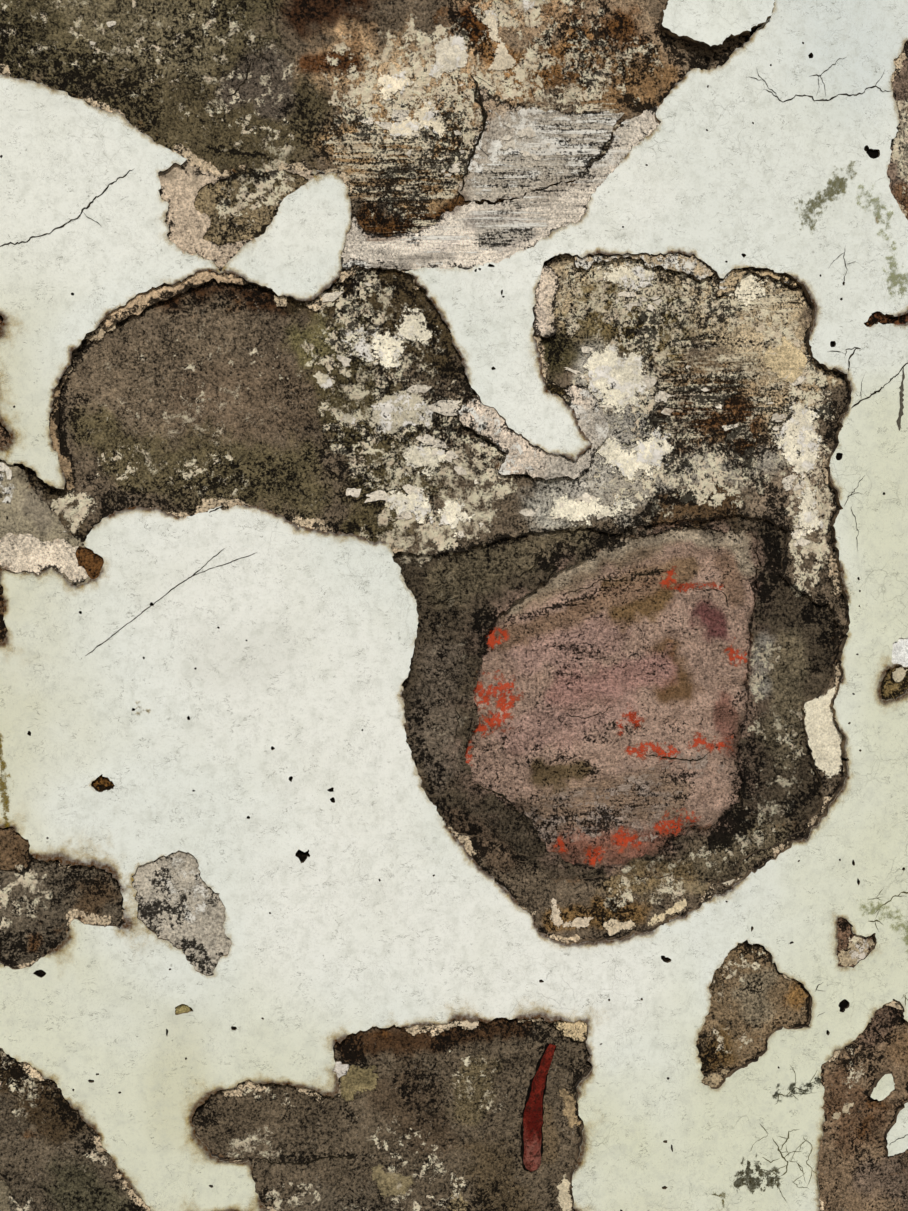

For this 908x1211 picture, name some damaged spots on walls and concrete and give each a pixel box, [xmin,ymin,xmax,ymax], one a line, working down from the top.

crack [1,168,135,246]
crack [751,57,893,102]
spalling [864,40,908,220]
crack [837,347,907,407]
spalling [0,0,860,947]
spalling [0,822,231,977]
peeling [175,1004,193,1014]
spalling [696,927,813,1087]
spalling [835,916,875,969]
spalling [0,1048,150,1211]
spalling [187,1011,593,1211]
spalling [816,999,908,1211]